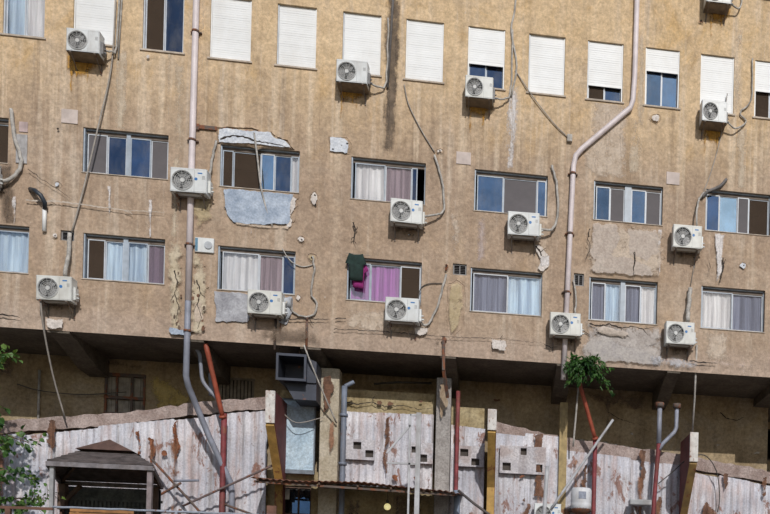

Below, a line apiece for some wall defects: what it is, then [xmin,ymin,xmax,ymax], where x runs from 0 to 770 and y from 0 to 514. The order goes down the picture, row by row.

water stain [383,0,400,149]
flaking render [215,126,295,150]
peeling [586,222,665,276]
crack [171,271,205,329]
peeling [583,321,662,364]
rust [135,422,181,486]
rust [520,465,544,514]